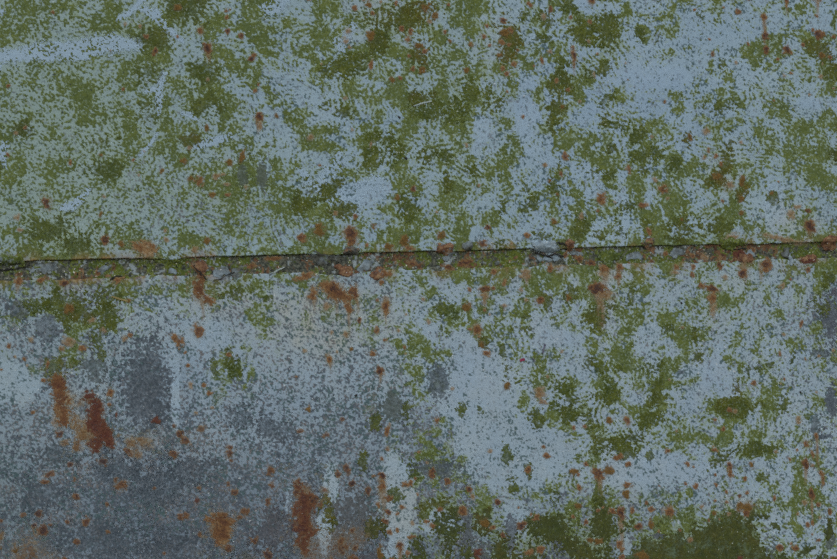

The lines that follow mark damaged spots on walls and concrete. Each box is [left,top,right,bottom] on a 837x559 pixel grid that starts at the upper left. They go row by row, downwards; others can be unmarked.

rust [293,272,361,324]
crack [535,242,567,259]
rust [563,245,624,316]
rust [41,361,153,467]
rust [198,508,250,552]
rust [289,478,367,559]